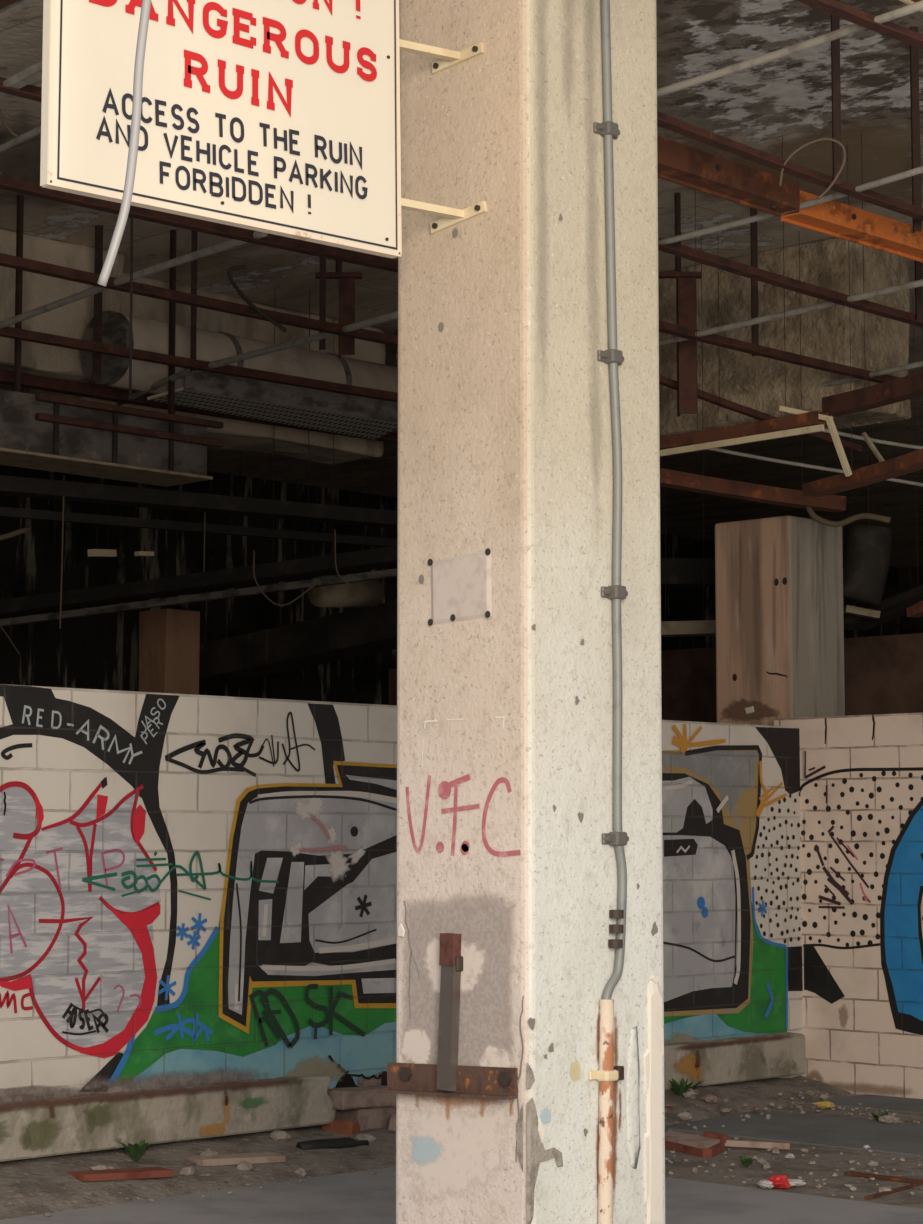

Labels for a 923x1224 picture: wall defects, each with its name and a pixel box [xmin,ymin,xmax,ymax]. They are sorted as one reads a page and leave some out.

damp [656,0,923,204]
corrosion [416,1095,490,1118]
spalling [516,1062,563,1224]
corrosion [597,1081,621,1193]
damp [808,1072,905,1094]